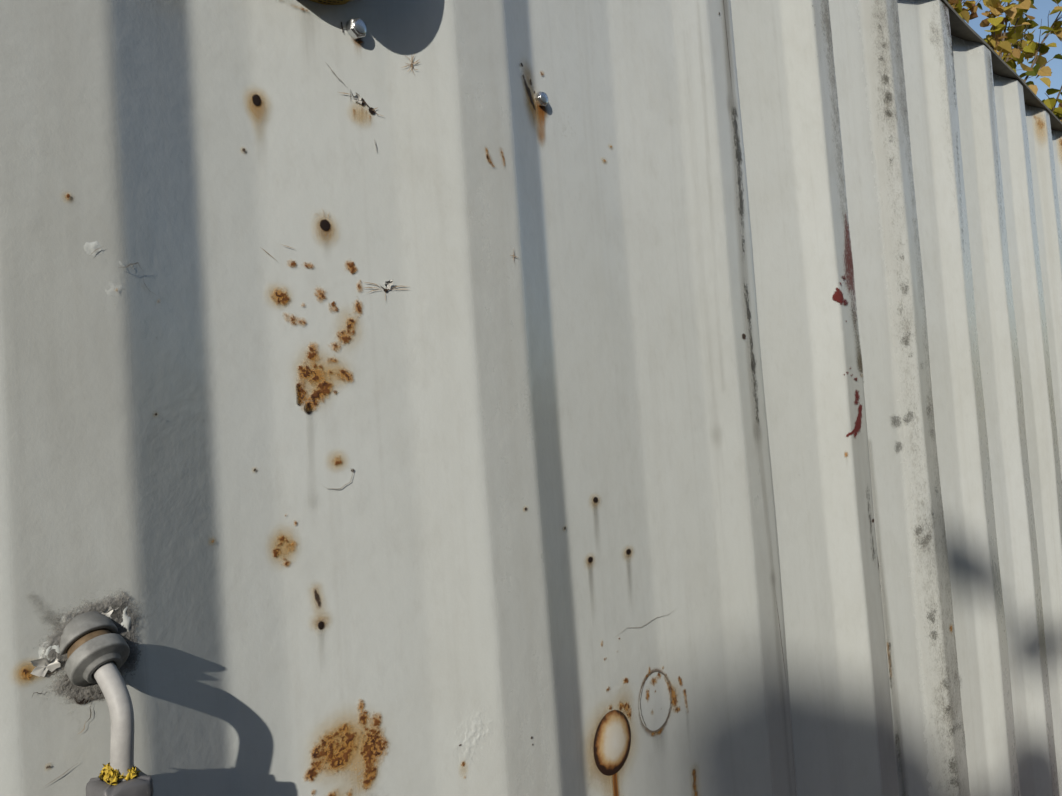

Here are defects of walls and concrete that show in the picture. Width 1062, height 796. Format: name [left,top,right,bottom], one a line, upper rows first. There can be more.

rust [521,63,546,139]
rust [272,290,305,325]
rust [296,261,362,414]
peeling [832,214,863,438]
rust [273,536,296,566]
peeling [30,657,60,677]
rust [646,668,687,712]
rust [305,700,388,796]